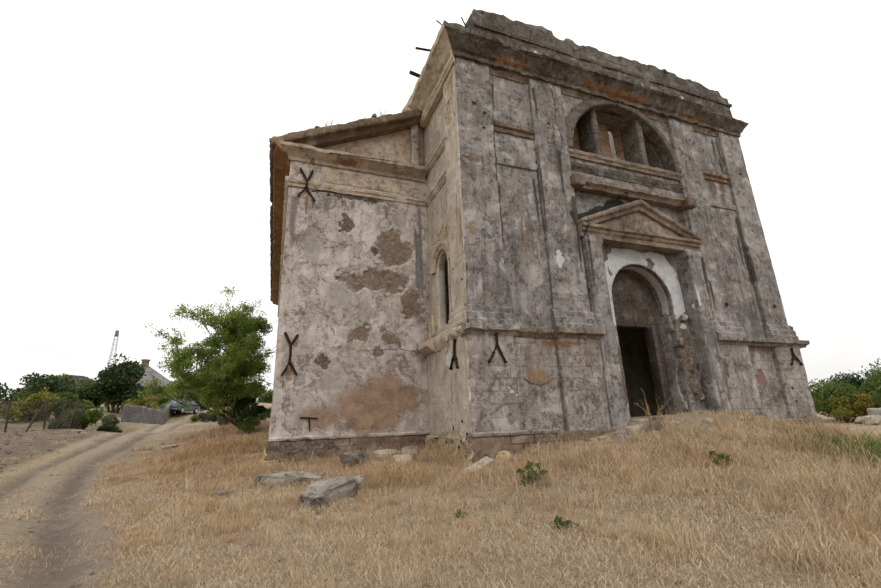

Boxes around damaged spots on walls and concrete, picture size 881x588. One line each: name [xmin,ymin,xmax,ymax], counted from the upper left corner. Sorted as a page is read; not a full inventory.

crack [312,190,375,204]
flaking render [554,250,567,268]
flaking render [334,232,426,359]
flaking render [604,248,702,329]
flaking render [314,355,330,369]